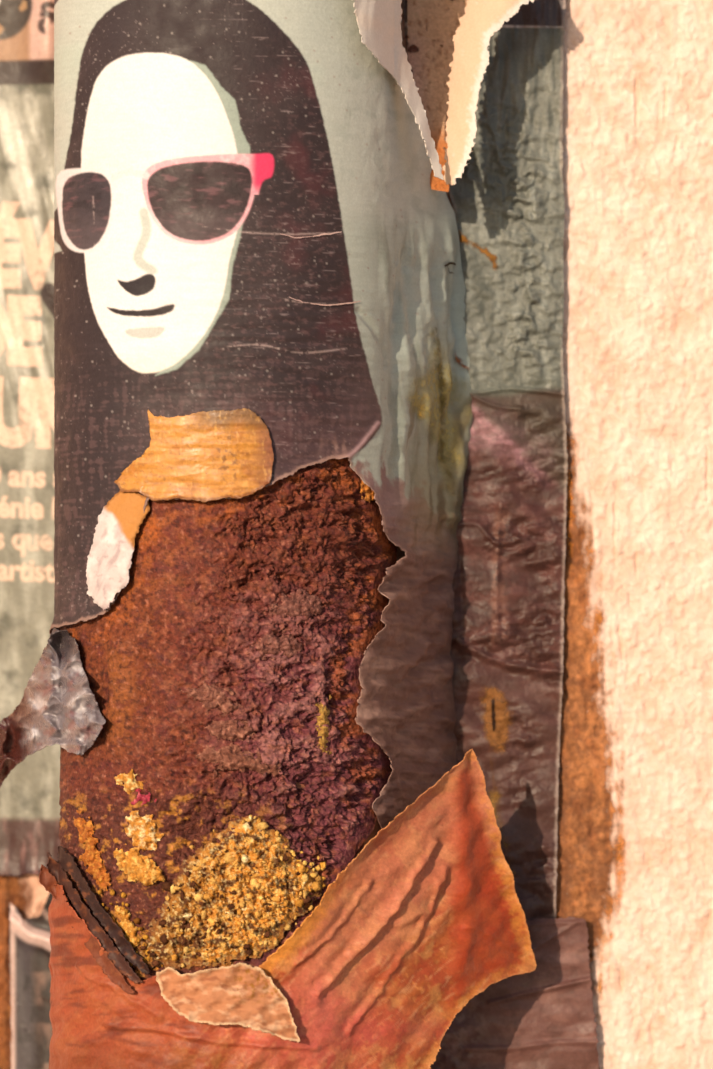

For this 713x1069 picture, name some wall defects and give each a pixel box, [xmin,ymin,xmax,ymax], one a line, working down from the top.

rust [59,457,397,980]